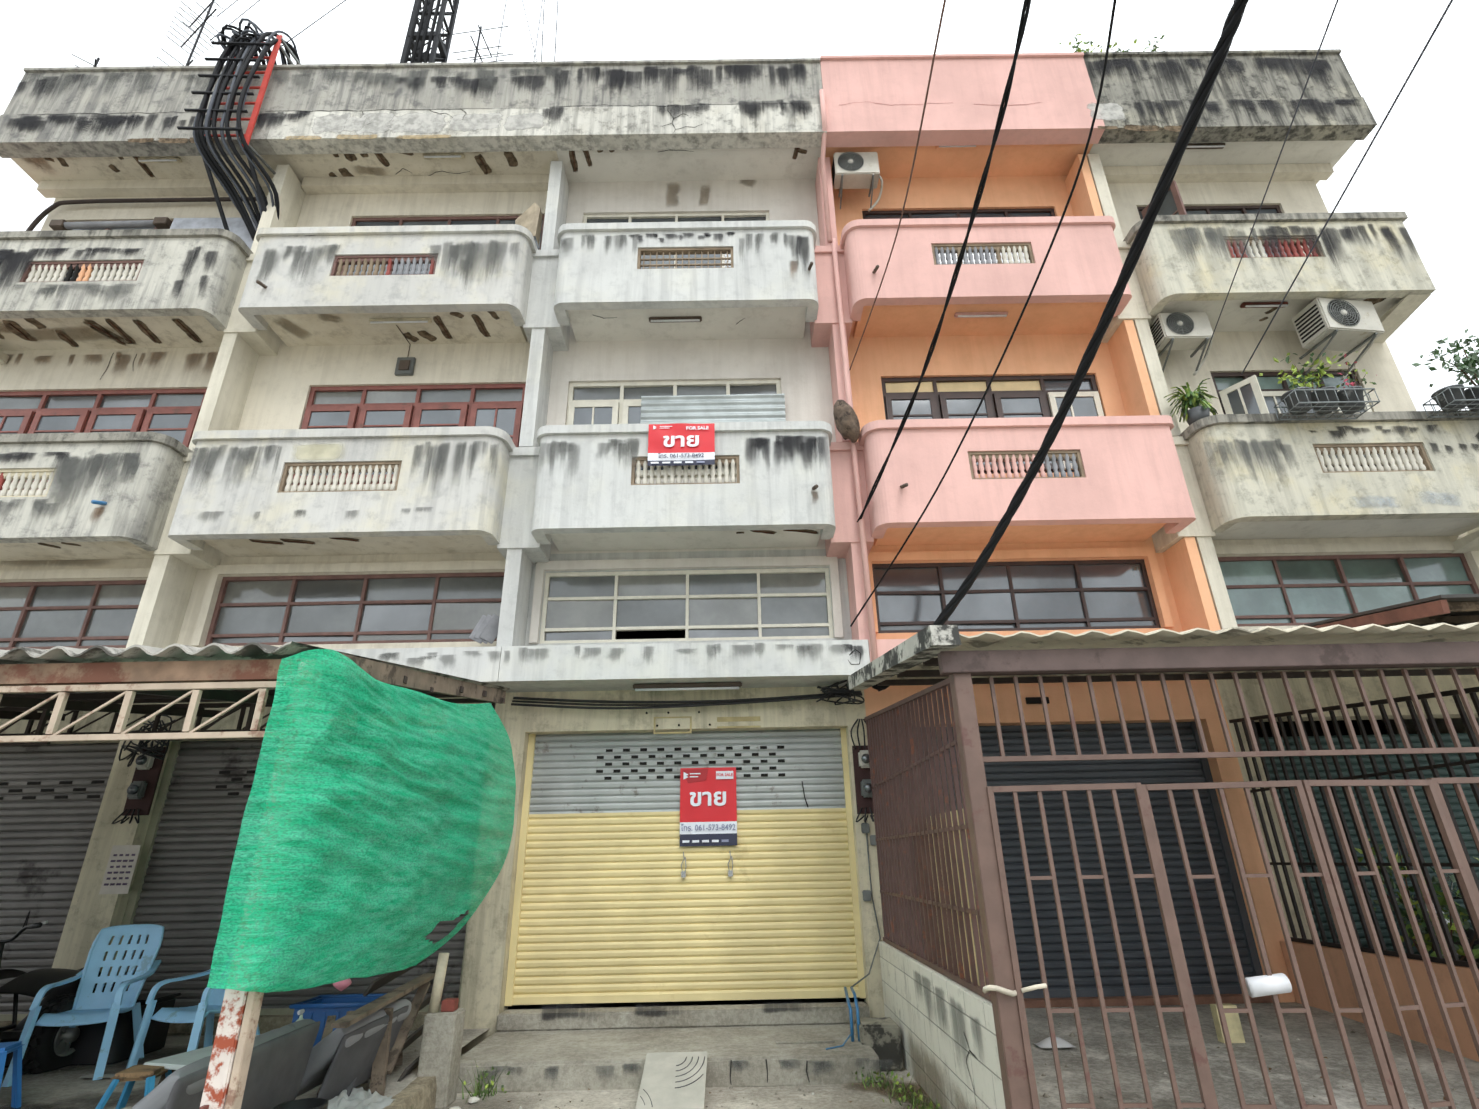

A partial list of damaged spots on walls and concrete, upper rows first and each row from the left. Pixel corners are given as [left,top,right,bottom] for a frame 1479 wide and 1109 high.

leakage [1088,57,1329,79]
leakage [8,114,206,130]
leakage [258,111,308,125]
leakage [1135,99,1354,115]
leakage [630,232,734,241]
leakage [796,236,808,263]
leakage [1261,224,1414,258]
leakage [0,247,139,283]
leakage [173,247,217,292]
leakage [1310,425,1436,437]
leakage [0,452,69,460]
leakage [747,436,826,461]